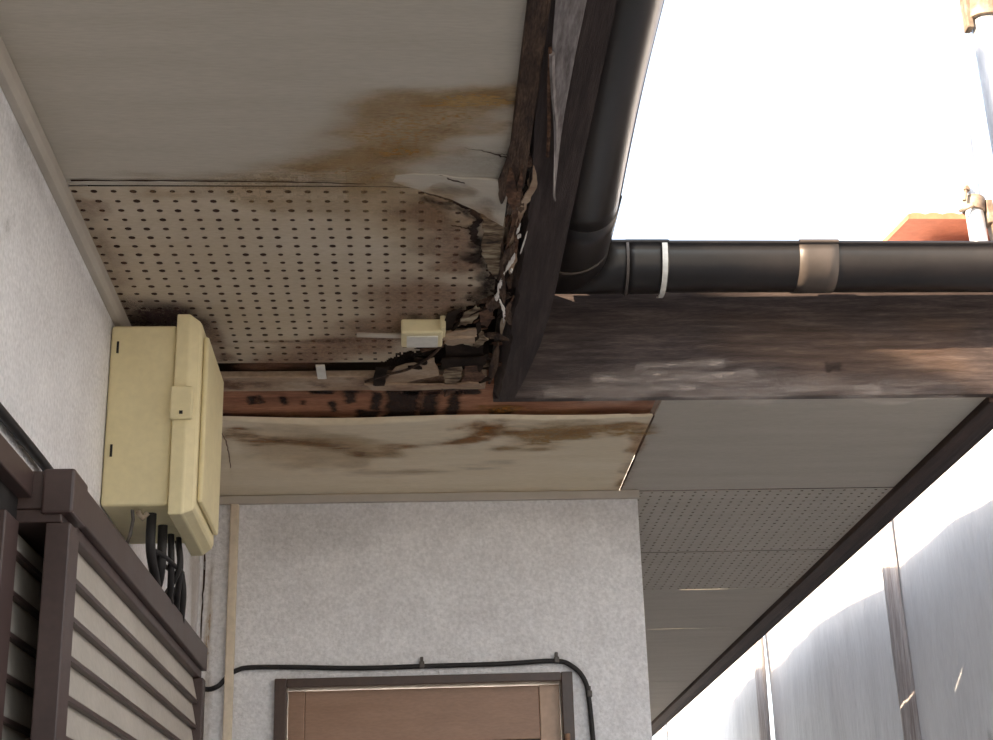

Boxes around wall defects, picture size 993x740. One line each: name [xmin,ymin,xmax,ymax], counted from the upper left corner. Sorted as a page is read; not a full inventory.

peeling [546,0,587,201]
peeling [450,223,527,341]
peeling [408,341,444,370]
leakage [302,376,481,418]
leakage [442,427,497,444]